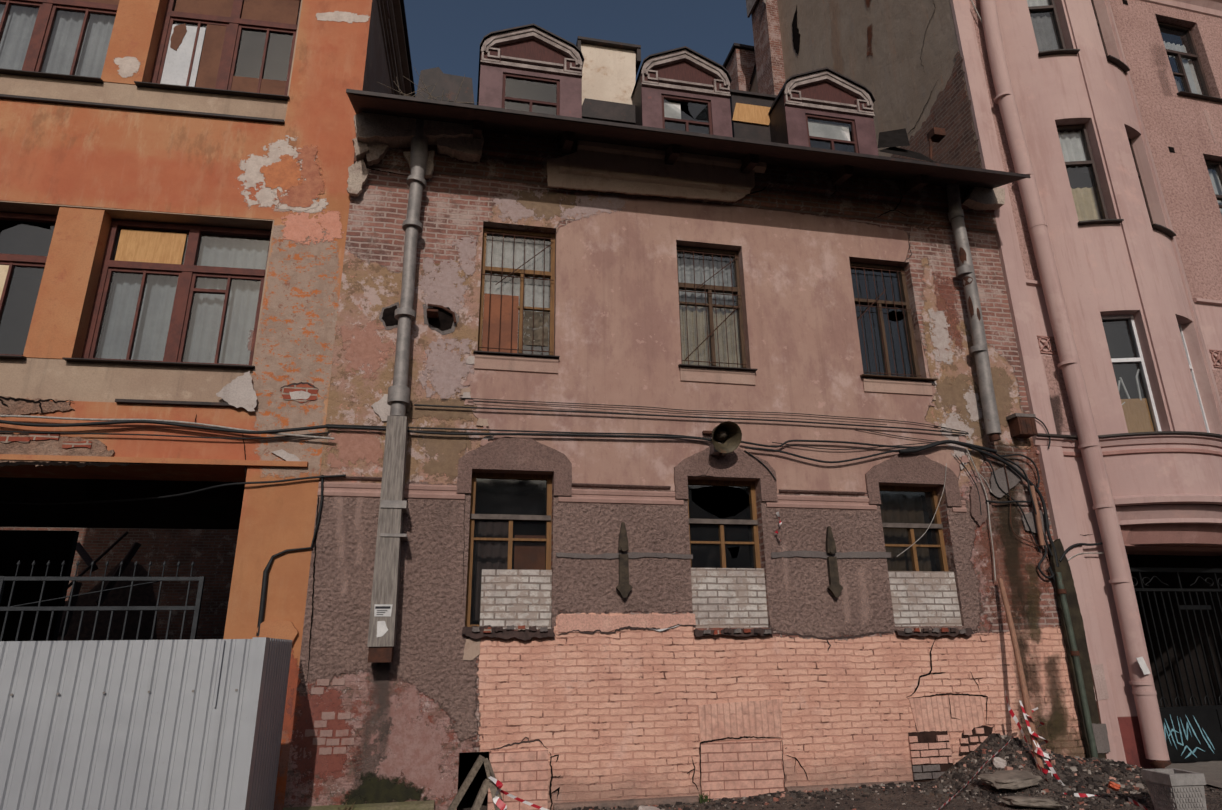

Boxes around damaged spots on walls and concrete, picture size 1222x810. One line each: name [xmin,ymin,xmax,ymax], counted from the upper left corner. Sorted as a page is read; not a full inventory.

peeling [238,135,345,245]
flaking render [280,382,319,403]
peeling [341,302,399,379]
peeling [407,236,493,481]
peeling [928,271,1013,470]
peeling [327,425,385,468]
leakage [991,484,1064,751]
peeling [283,650,455,799]
crack [549,753,561,810]
crack [687,736,809,795]
crack [908,638,988,730]